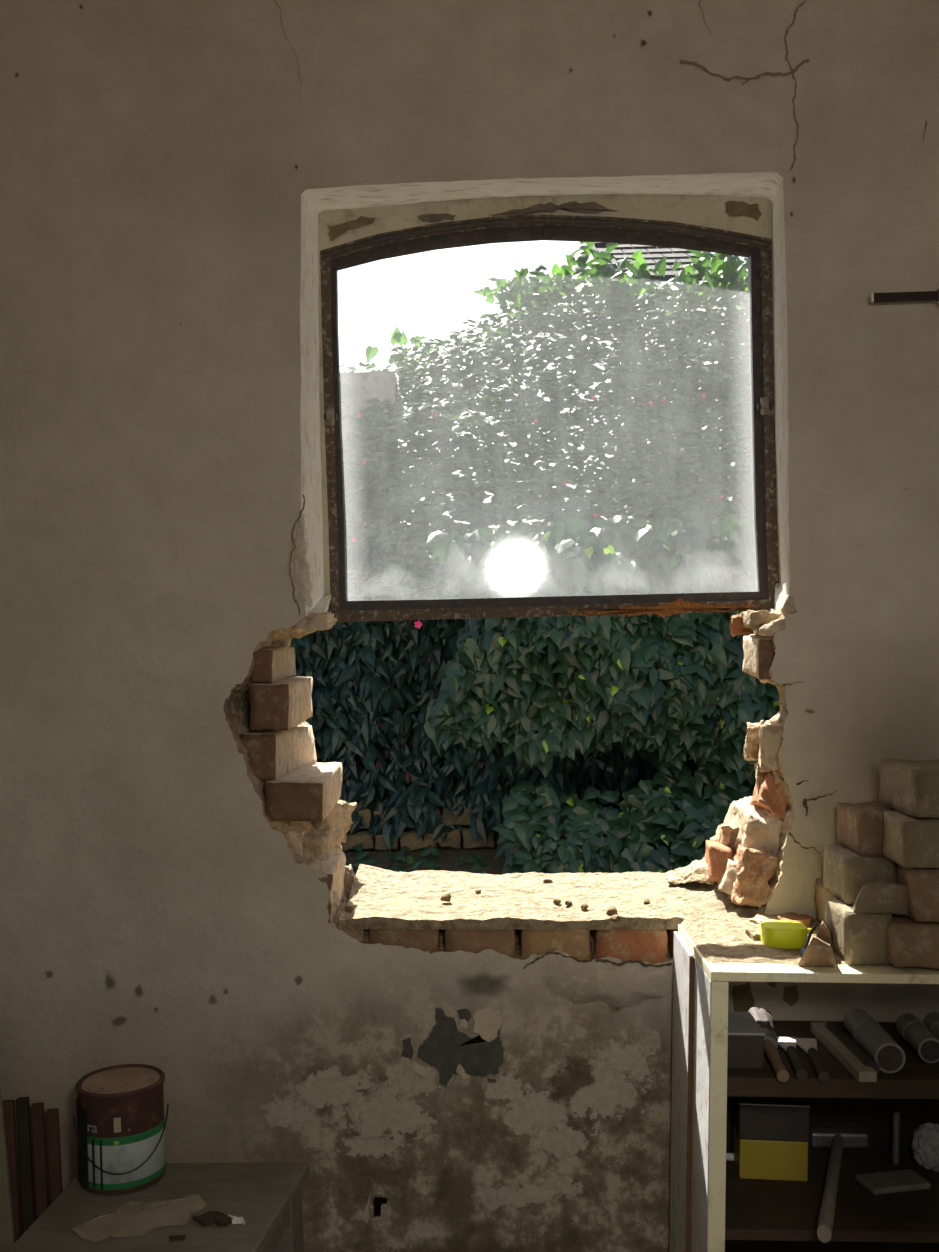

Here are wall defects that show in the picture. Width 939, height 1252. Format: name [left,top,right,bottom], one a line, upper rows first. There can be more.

crack [680,0,810,171]
peeling [725,201,761,221]
spalling [289,495,338,634]
spalling [729,595,796,680]
spalling [240,647,788,963]
peeling [402,1007,504,1086]
water stain [465,976,501,993]
spalling [777,912,835,968]
water stain [258,1051,453,1186]
water stain [412,1029,665,1252]